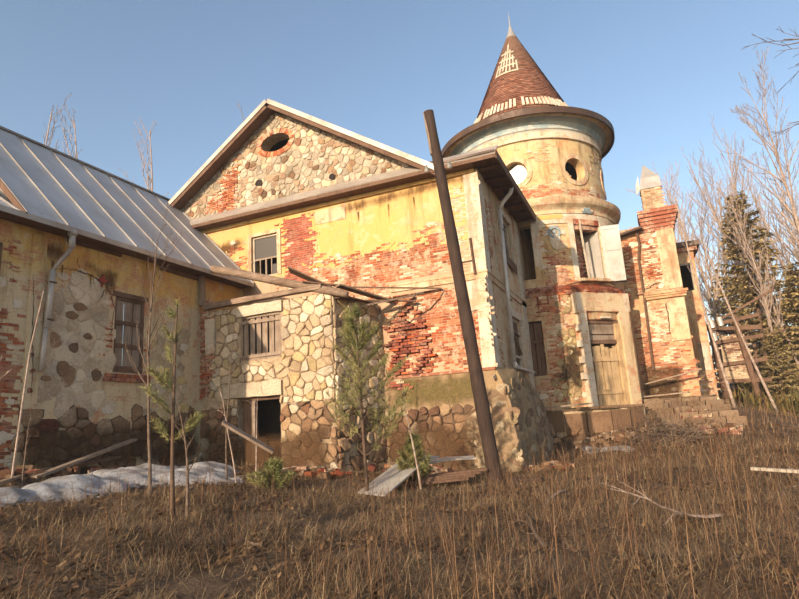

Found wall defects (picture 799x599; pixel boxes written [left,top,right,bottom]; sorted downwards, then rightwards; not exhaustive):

flaking render [0,298,69,469]
flaking render [65,302,88,320]
flaking render [68,333,93,353]
flaking render [91,368,105,381]
flaking render [204,159,242,215]
flaking render [274,211,468,395]
peeling [449,185,470,273]
spalling [469,194,506,381]
flaking render [526,225,587,403]
flaking render [621,227,664,293]
flaking render [633,300,721,399]